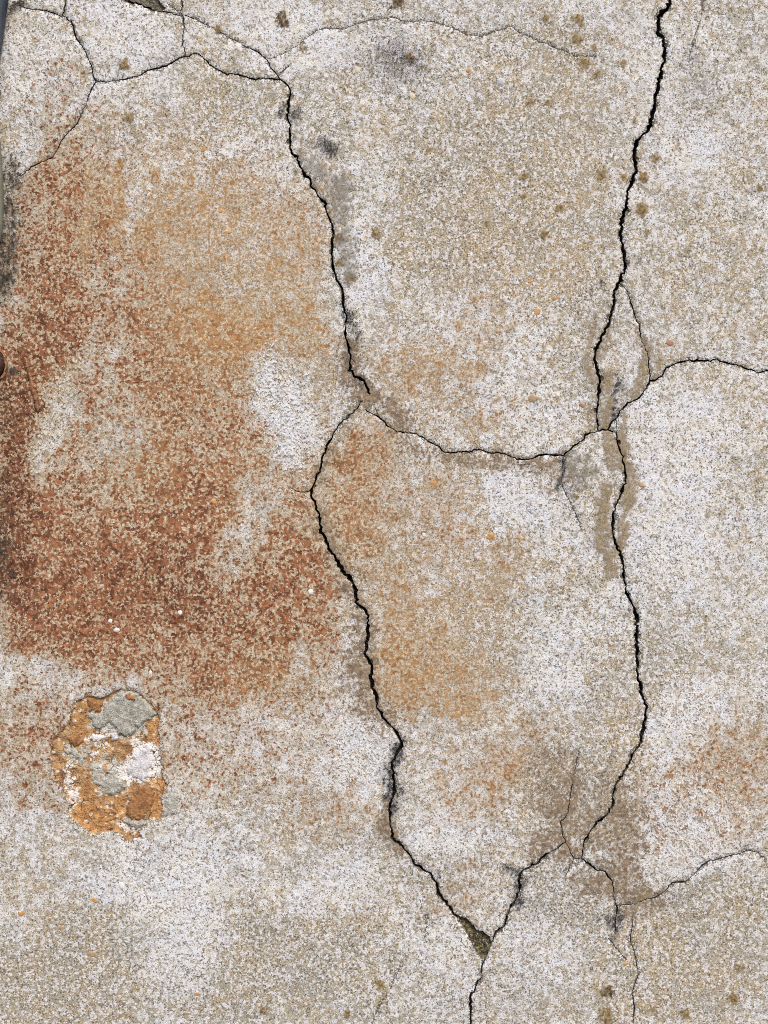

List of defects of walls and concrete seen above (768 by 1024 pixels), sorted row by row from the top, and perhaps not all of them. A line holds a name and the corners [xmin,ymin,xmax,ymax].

crack [11,0,596,395]
corrosion [0,41,574,857]
crack [291,0,768,956]
spalling [50,689,179,841]
corrosion [420,849,483,927]
crack [468,959,485,1024]
crack [630,917,638,1022]